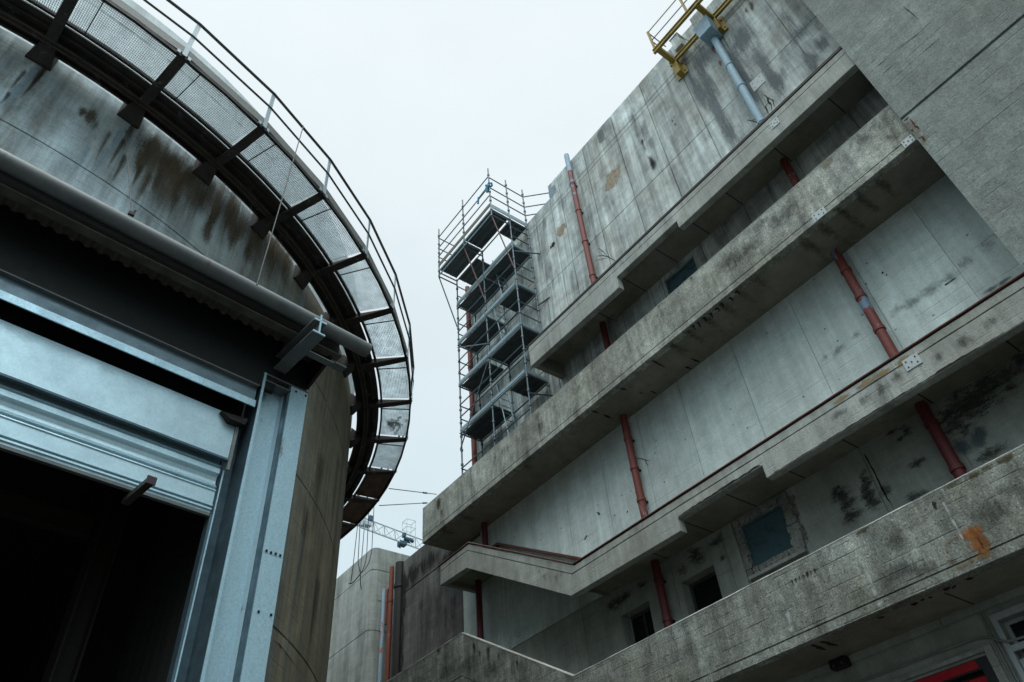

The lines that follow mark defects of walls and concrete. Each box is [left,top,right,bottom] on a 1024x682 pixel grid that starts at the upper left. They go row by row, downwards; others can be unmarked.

damp [79,108,97,125]
damp [83,125,290,278]
damp [939,353,1024,488]
damp [832,470,891,535]
crack [864,454,894,508]
corrosion [951,526,989,569]